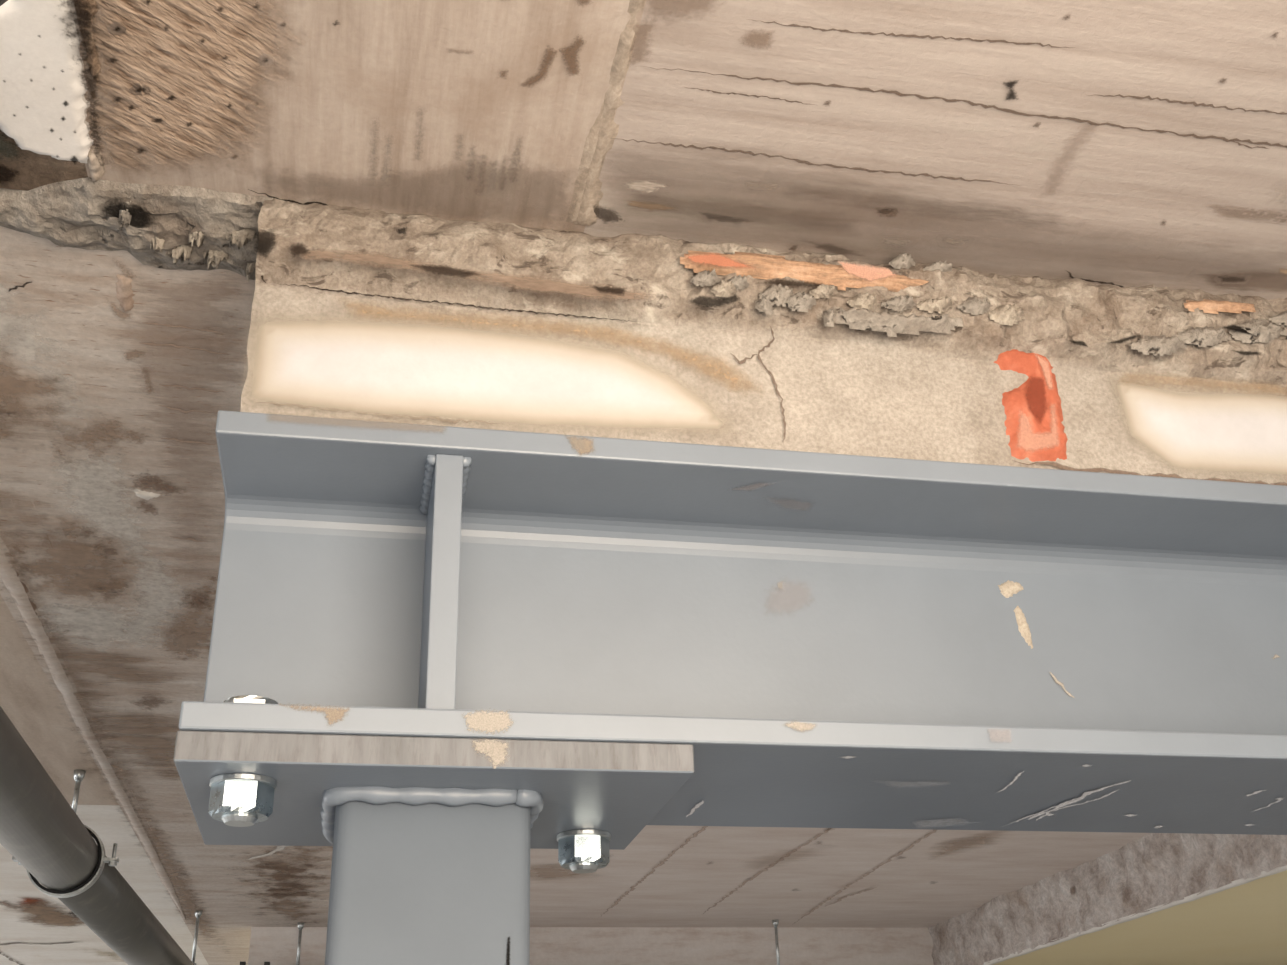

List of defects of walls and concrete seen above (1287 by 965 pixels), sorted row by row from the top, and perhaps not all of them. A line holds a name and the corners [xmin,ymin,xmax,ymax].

crack [748,19,1069,48]
crack [644,66,1287,149]
peeling [118,201,132,228]
peeling [594,181,673,222]
crack [622,139,1015,185]
spalling [300,250,650,300]
flaking render [680,239,1026,327]
peeling [1130,311,1287,356]
crack [730,326,786,439]
leakage [41,458,178,643]
leakage [104,751,214,935]
crack [601,826,707,916]